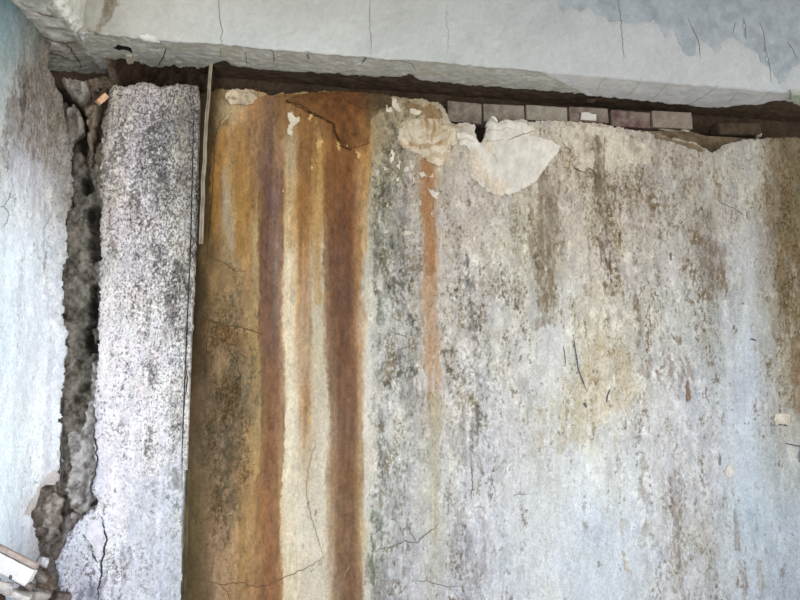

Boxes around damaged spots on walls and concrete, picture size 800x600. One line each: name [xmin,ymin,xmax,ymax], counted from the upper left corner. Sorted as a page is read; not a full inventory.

crack [733,18,771,99]
crack [31,40,113,599]
rust [209,93,391,600]
leakage [364,160,418,600]
rust [412,154,446,546]
flaking render [375,96,654,198]
leakage [527,168,562,332]
leakage [583,134,619,299]
leakage [525,291,694,455]
leakage [688,233,730,304]
flaking render [24,470,60,517]
flaking render [85,519,104,557]